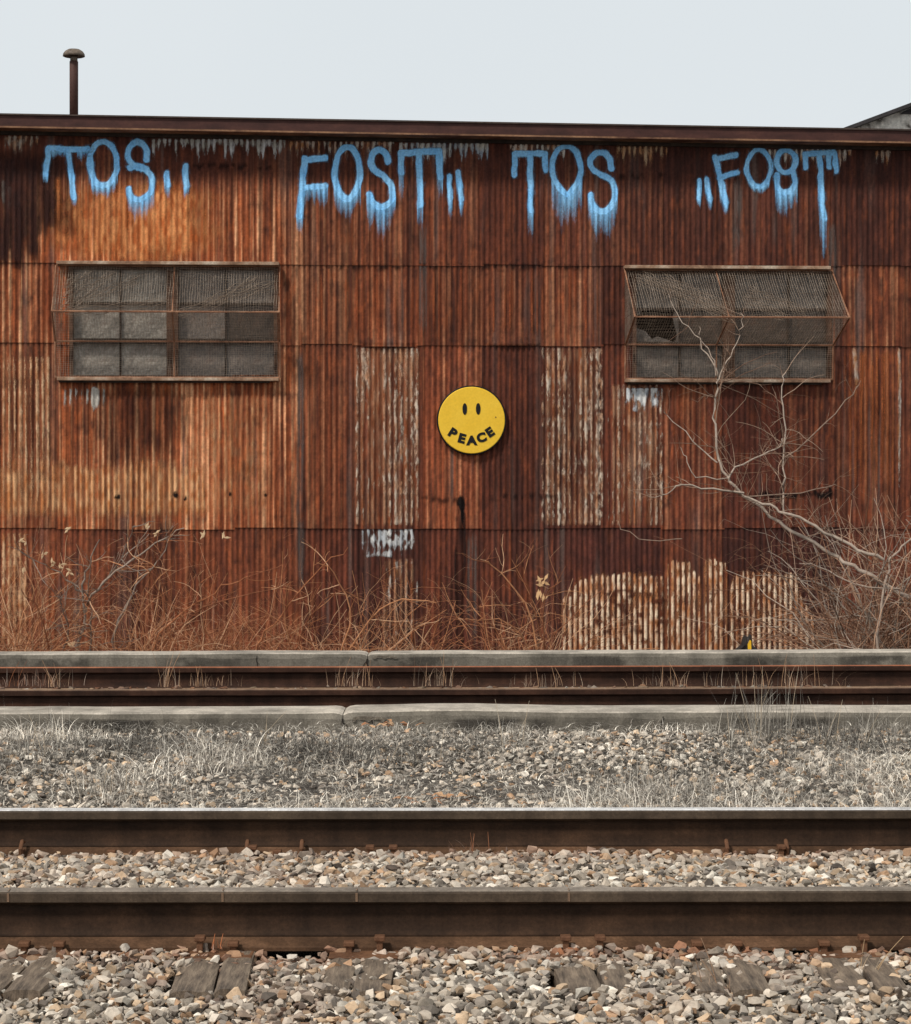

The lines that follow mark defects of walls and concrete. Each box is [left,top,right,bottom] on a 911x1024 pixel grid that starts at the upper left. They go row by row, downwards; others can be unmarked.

corrosion [56,180,206,261]
corrosion [2,402,231,515]
peeling [355,348,419,659]
peeling [541,348,663,525]
corrosion [850,353,898,477]
corrosion [604,590,643,617]
peeling [563,559,820,650]